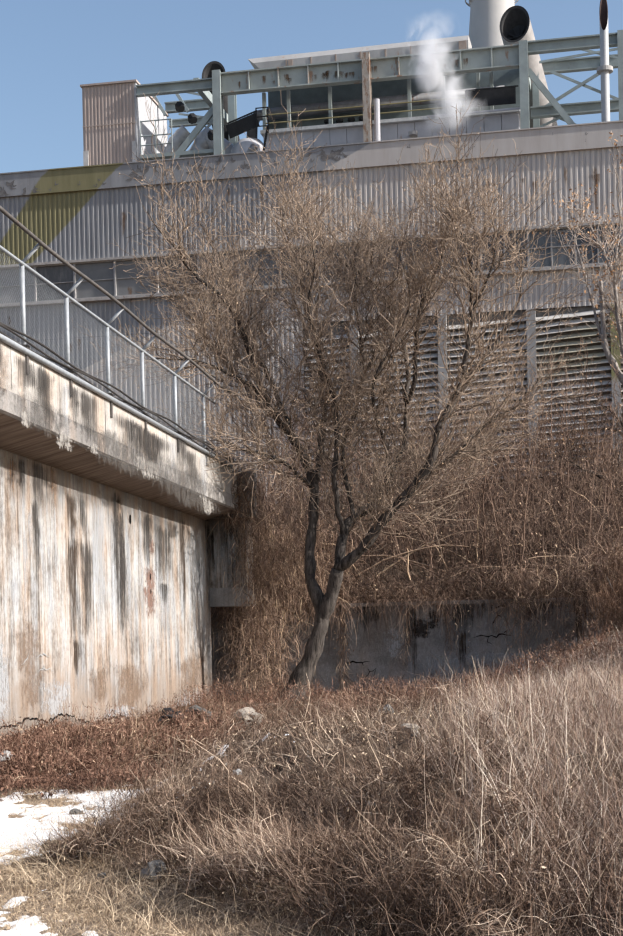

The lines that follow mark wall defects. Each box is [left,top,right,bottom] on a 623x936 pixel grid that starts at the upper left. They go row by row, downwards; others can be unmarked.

leakage [16,358,99,432]
leakage [116,414,207,483]
leakage [19,459,56,572]
leakage [67,492,240,633]
leakage [407,604,485,682]
crack [474,605,511,644]
crack [0,713,132,729]